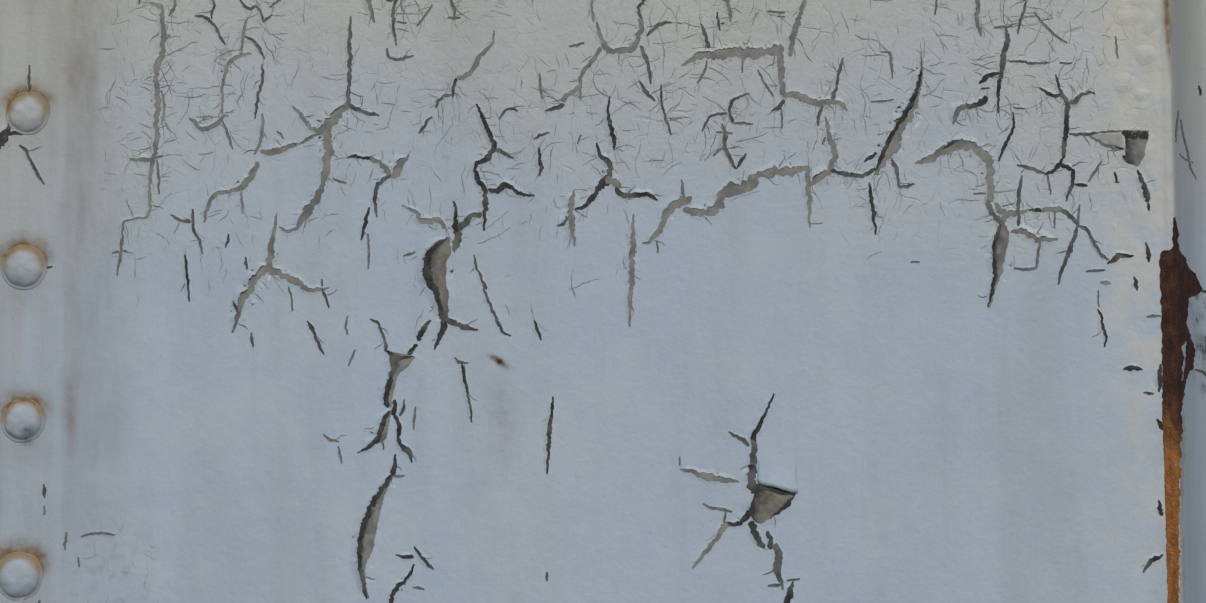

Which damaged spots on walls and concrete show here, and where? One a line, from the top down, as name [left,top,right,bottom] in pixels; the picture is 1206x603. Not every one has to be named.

peeling [0,122,46,185]
crack [521,0,1156,327]
peeling [1088,126,1155,184]
crack [99,0,561,603]
crack [1092,290,1111,347]
crack [1146,311,1161,319]
corrosion [1159,217,1203,603]
crack [678,393,800,603]
crack [1142,553,1164,573]